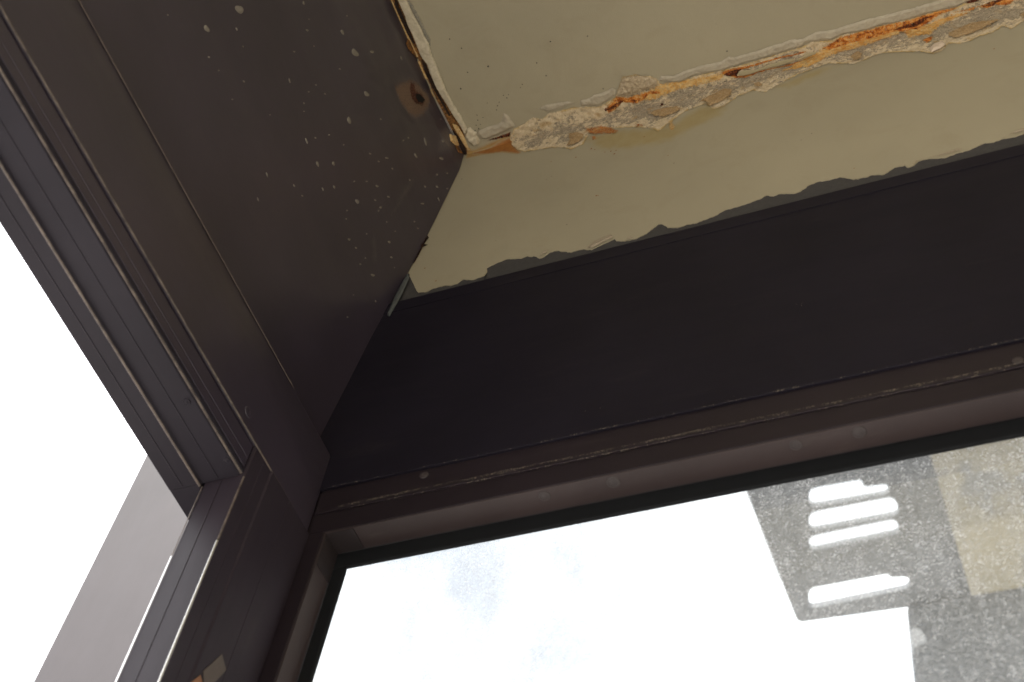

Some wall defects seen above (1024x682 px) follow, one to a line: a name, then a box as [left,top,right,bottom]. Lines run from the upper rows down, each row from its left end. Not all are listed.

rust [391,0,522,160]
spalling [398,0,1024,152]
rust [604,0,1014,113]